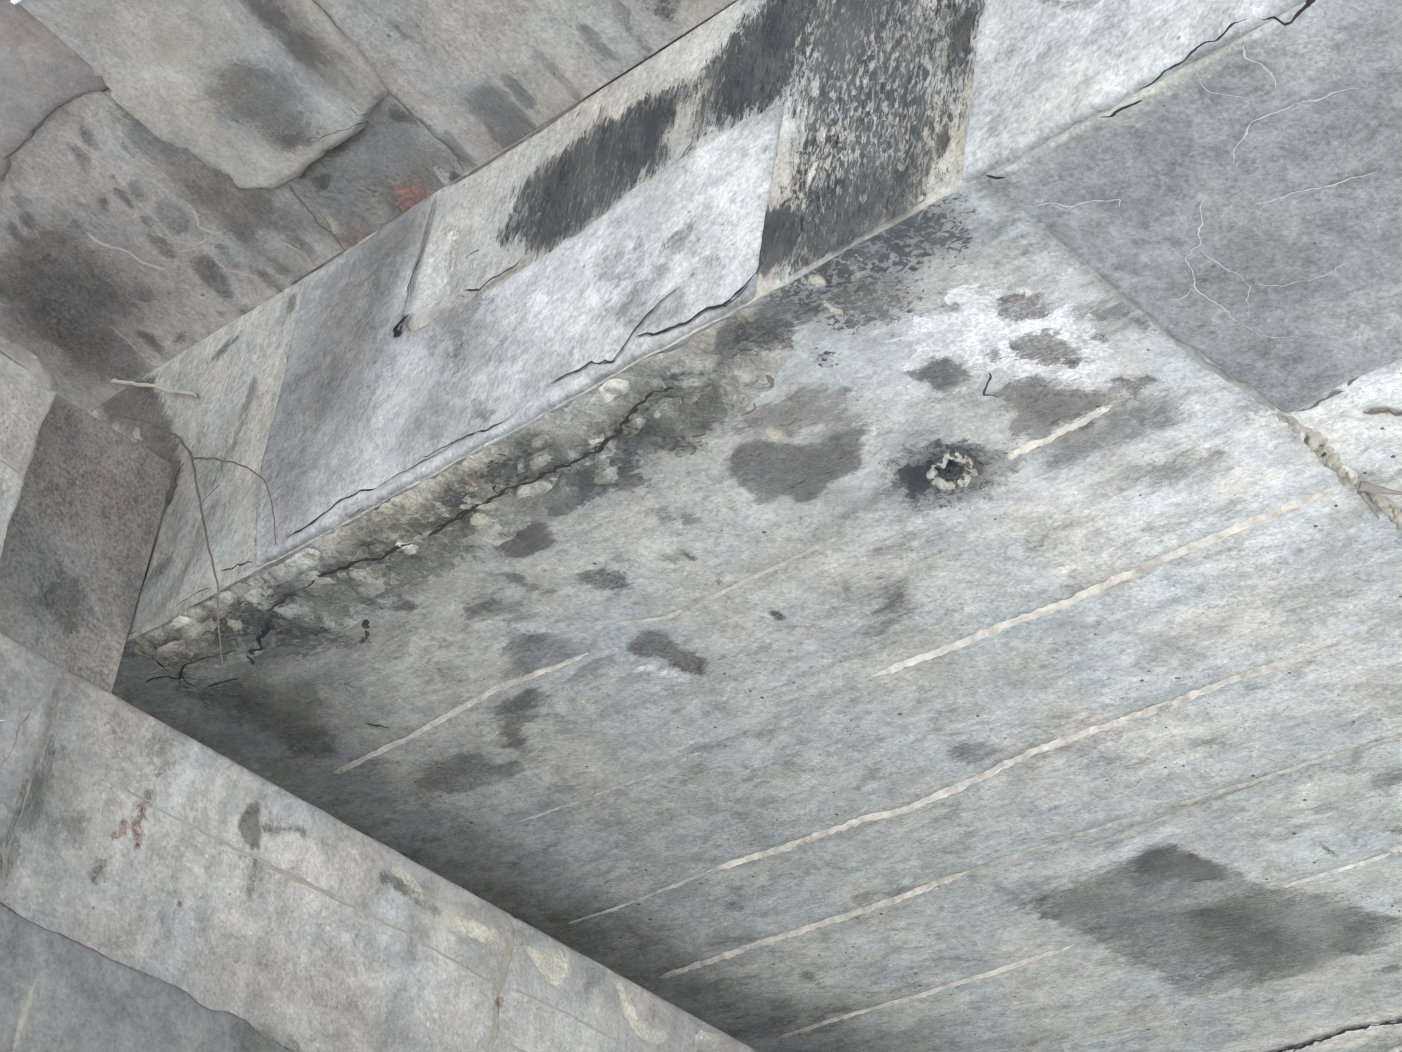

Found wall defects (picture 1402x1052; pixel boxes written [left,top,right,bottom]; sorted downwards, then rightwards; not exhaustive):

leakage [467,76,535,148]
crack [1100,0,1358,164]
leakage [494,0,1130,398]
leakage [95,378,181,483]
crack [128,387,674,688]
leakage [433,441,533,511]
leakage [498,418,715,558]
leakage [729,347,870,503]
leakage [201,579,370,666]
leakage [627,632,706,682]
leakage [1035,848,1401,991]
crack [1277,1020,1402,1052]